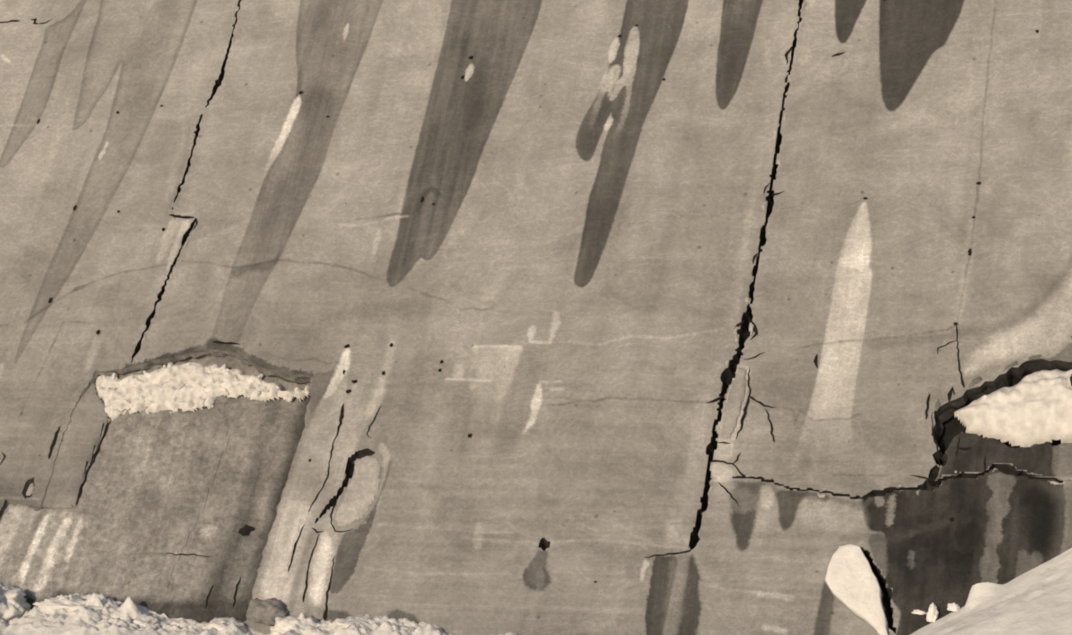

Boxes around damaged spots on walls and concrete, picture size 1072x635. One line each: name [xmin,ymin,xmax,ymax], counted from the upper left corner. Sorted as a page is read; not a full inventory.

crack [76,421,111,505]
damp [0,0,201,384]
spalling [0,349,311,591]
damp [150,0,239,275]
crack [0,0,389,363]
damp [204,0,387,342]
crack [288,403,395,621]
damp [0,305,839,635]
damp [334,0,547,293]
crack [537,0,1066,558]
damp [566,0,1072,635]
spalling [928,354,1072,486]